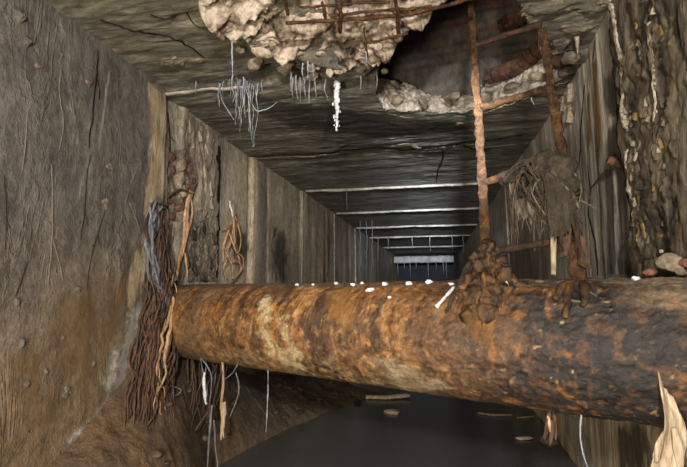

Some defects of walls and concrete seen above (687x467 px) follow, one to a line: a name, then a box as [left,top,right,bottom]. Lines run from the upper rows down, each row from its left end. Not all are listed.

crack [100,12,206,59]
spalling [198,0,576,125]
leakage [263,103,472,137]
crack [252,116,522,182]
rust [330,288,354,327]